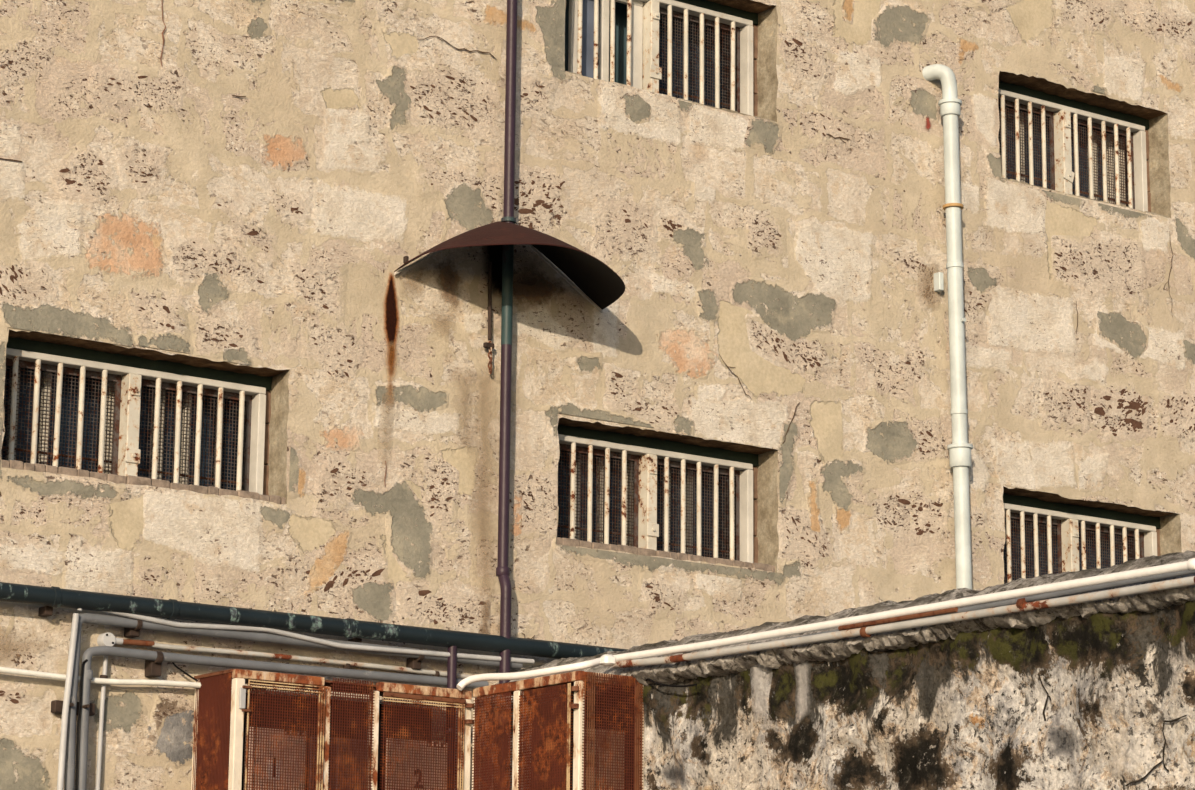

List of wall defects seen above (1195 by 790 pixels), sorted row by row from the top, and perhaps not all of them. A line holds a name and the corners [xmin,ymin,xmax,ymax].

crack [159,0,167,67]
rust [385,274,399,403]
damp [436,263,460,304]
damp [485,245,565,305]
spalling [591,190,698,303]
peeling [512,298,792,450]
spalling [960,176,1195,533]
spalling [289,403,462,532]
peeling [0,488,491,634]
damp [643,601,1195,790]
crack [1125,715,1187,786]